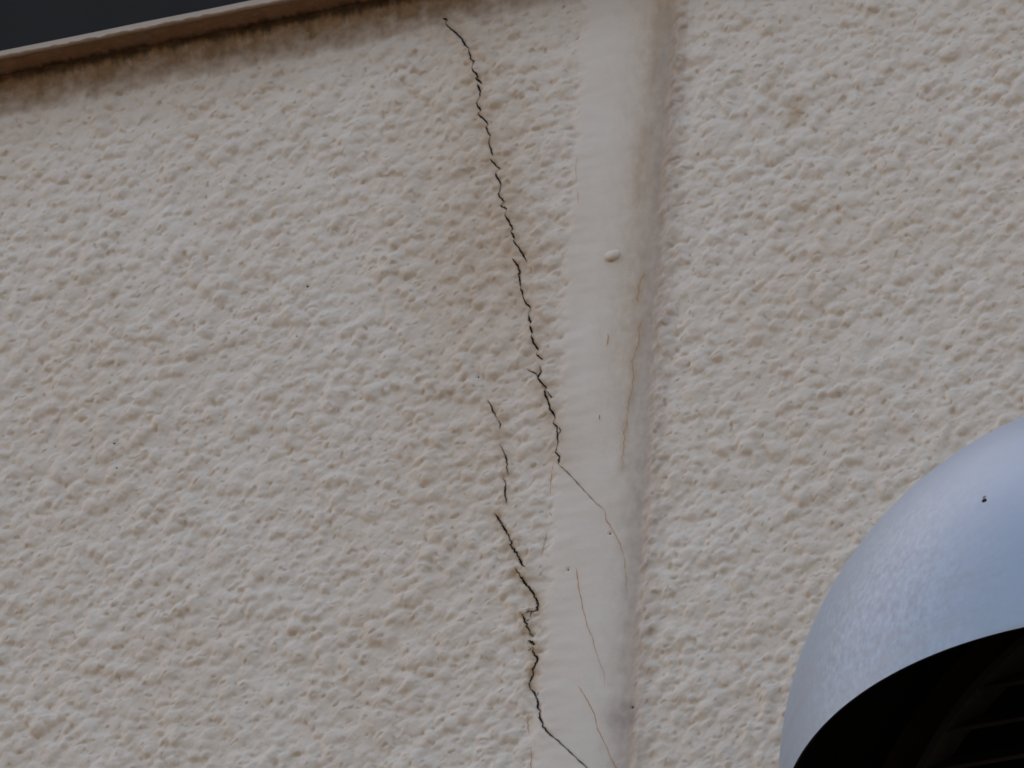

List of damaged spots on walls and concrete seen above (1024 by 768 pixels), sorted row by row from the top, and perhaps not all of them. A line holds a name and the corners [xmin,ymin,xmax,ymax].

crack [443,18,616,768]